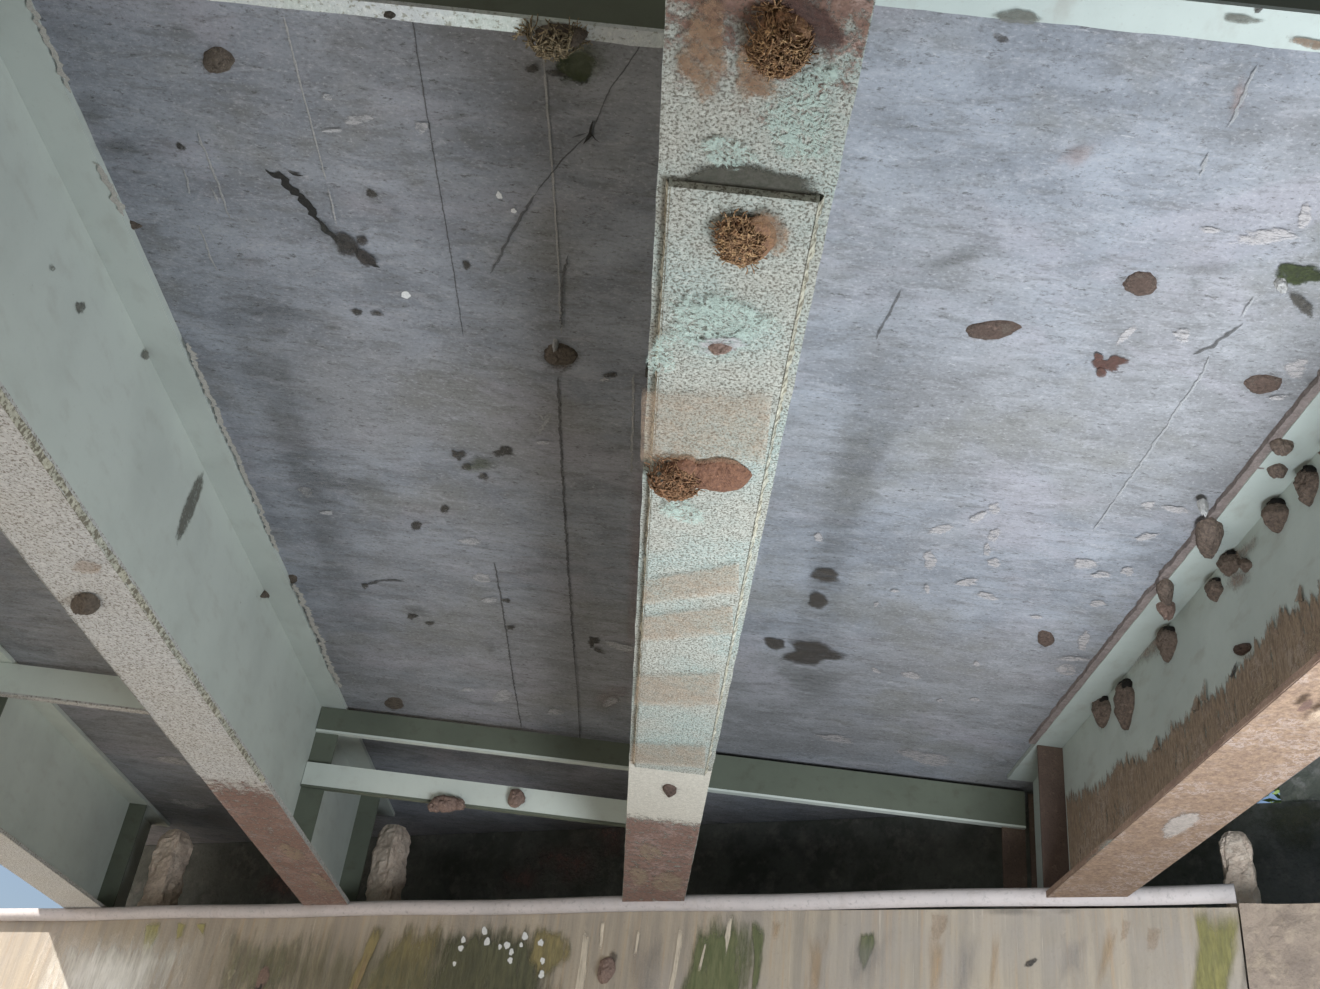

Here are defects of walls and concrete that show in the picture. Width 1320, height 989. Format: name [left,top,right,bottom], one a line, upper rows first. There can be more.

rust [664,0,874,103]
crack [412,22,463,333]
crack [490,46,640,273]
crack [560,256,568,327]
crack [557,379,580,738]
peeling [1230,643,1252,677]
rust [1034,580,1320,909]
rust [202,776,348,905]
rust [622,814,700,902]